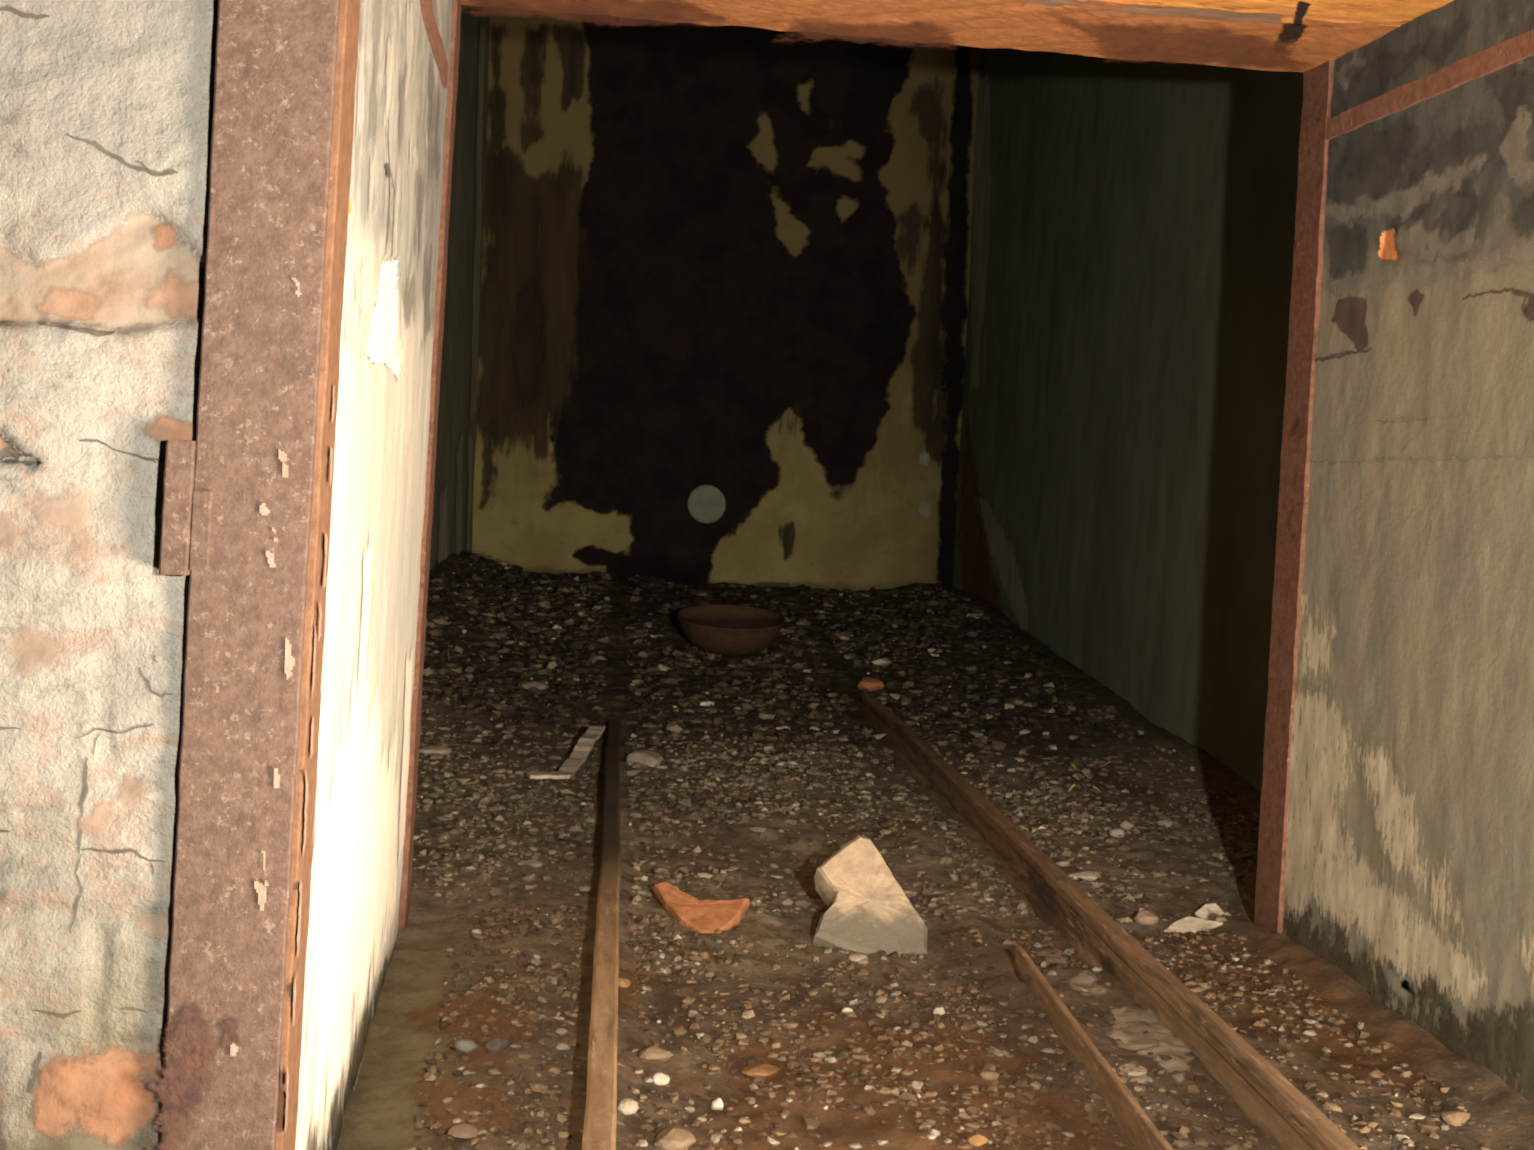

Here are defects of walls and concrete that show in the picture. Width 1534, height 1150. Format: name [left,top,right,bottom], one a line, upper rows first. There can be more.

spalling [0,212,206,337]
crack [67,133,178,176]
leakage [359,0,382,136]
leakage [399,65,407,153]
leakage [405,57,441,342]
peeling [1324,66,1534,351]
crack [69,655,173,933]
leakage [306,534,413,1150]
leakage [1284,592,1534,1105]
peeling [33,1047,162,1145]
rust [147,1003,241,1150]